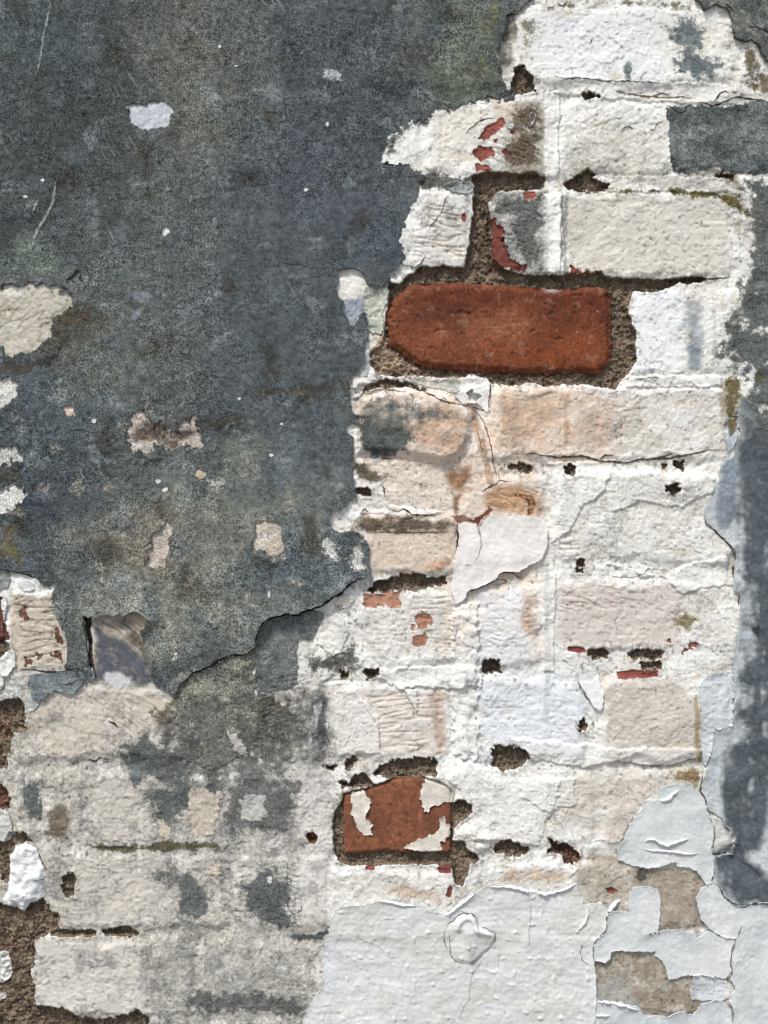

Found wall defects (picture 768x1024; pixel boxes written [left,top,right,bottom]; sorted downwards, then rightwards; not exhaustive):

flaking render [0,0,706,772]
crack [363,381,717,492]
crack [178,577,369,686]
peeling [302,397,768,1024]
spalling [0,784,149,1024]